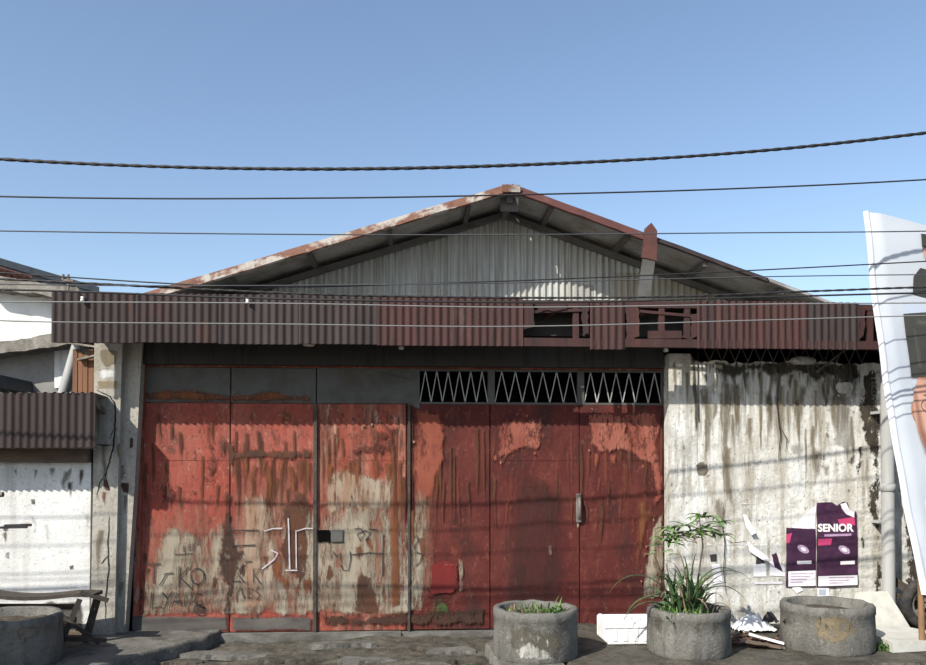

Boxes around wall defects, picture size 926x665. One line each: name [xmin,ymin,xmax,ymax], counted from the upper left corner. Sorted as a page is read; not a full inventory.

corrosion [144,413,182,506]
corrosion [193,422,311,619]
peeling [143,461,431,619]
corrosion [355,575,378,614]
corrosion [347,425,402,606]
peeling [494,414,543,464]
corrosion [637,415,663,556]
water stain [673,357,880,498]
water stain [868,478,881,529]